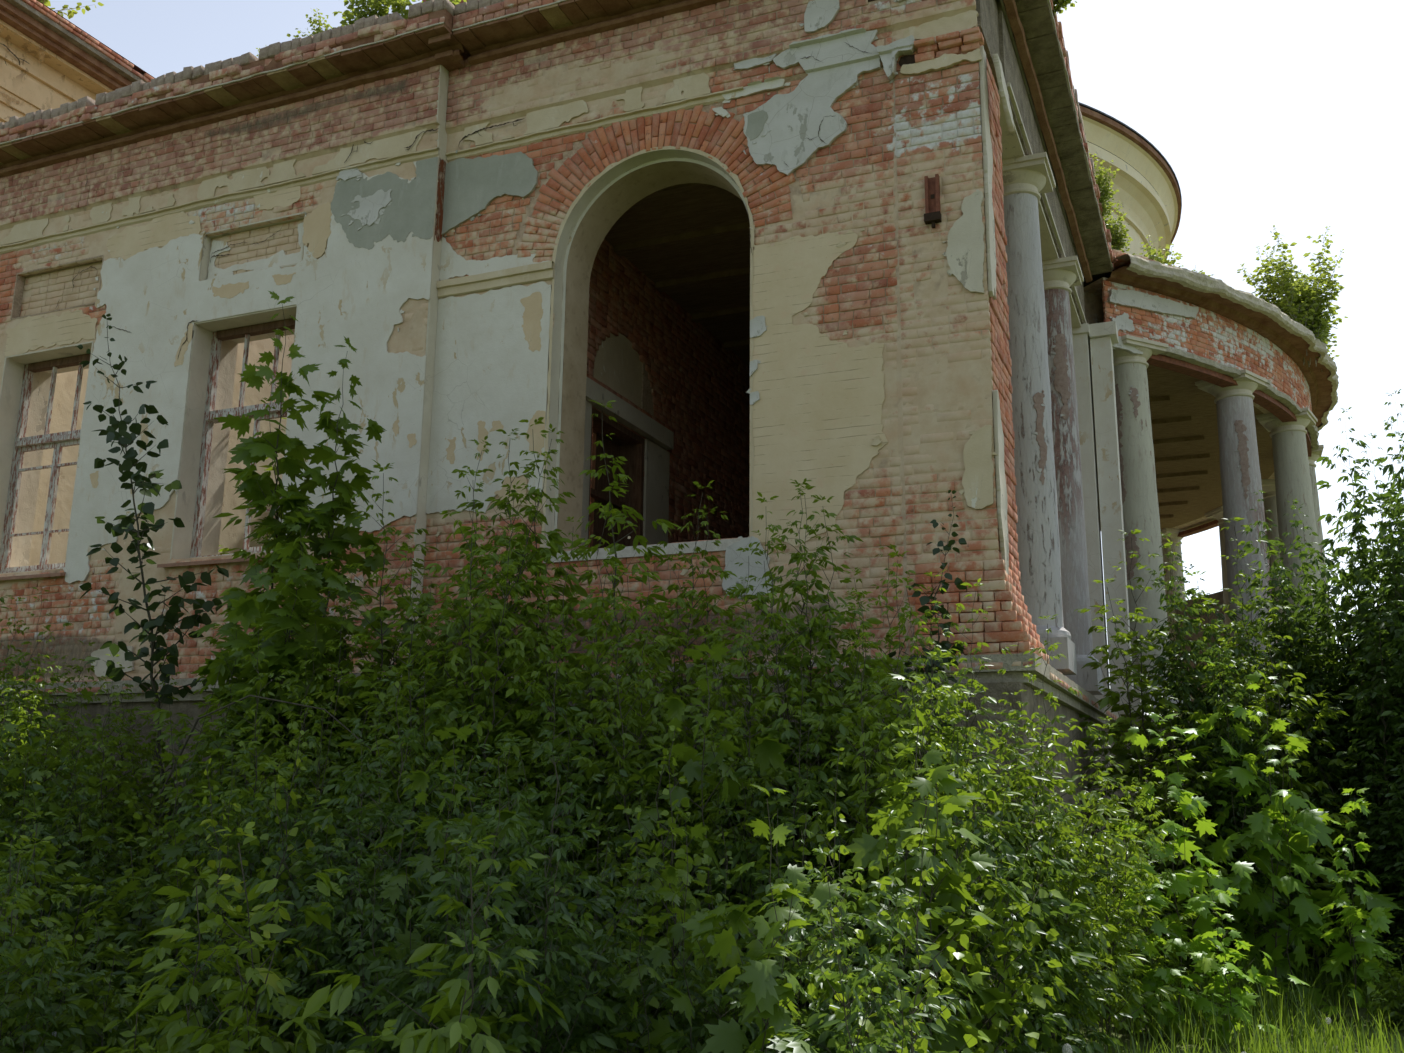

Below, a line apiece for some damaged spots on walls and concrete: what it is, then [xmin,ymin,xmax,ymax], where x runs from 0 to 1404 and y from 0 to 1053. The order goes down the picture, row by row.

flaking render [302,150,541,261]
spalling [712,0,916,352]
spalling [0,237,110,336]
peeling [174,323,193,367]
peeling [212,281,249,299]
peeling [746,360,761,405]
peeling [959,390,1009,575]
peeling [1033,334,1071,485]
peeling [1115,384,1141,506]
peeling [1234,420,1251,499]
spalling [33,520,200,632]
peeling [1124,529,1141,580]